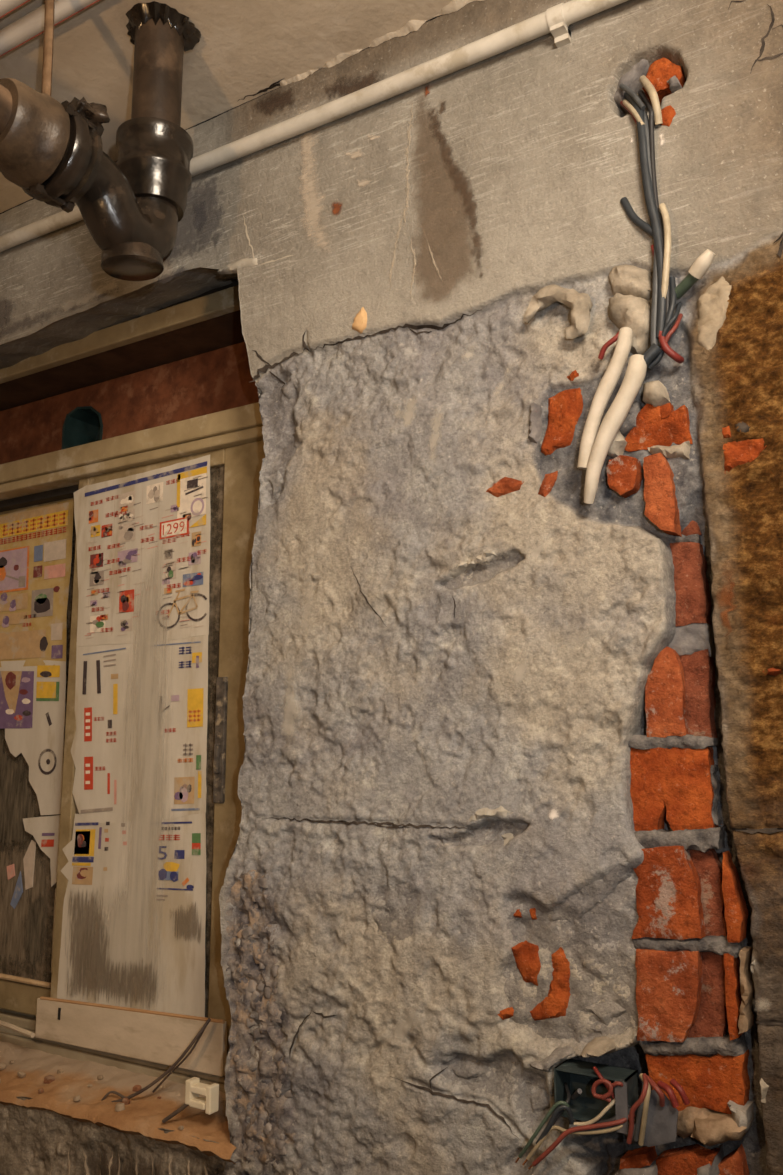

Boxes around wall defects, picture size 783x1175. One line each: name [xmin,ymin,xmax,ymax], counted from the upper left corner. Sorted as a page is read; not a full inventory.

crack [728,0,783,74]
water stain [390,102,483,299]
crack [250,310,479,390]
flaking render [722,422,767,473]
flaking render [438,370,759,1175]
crack [257,817,491,829]
crack [396,1068,519,1139]